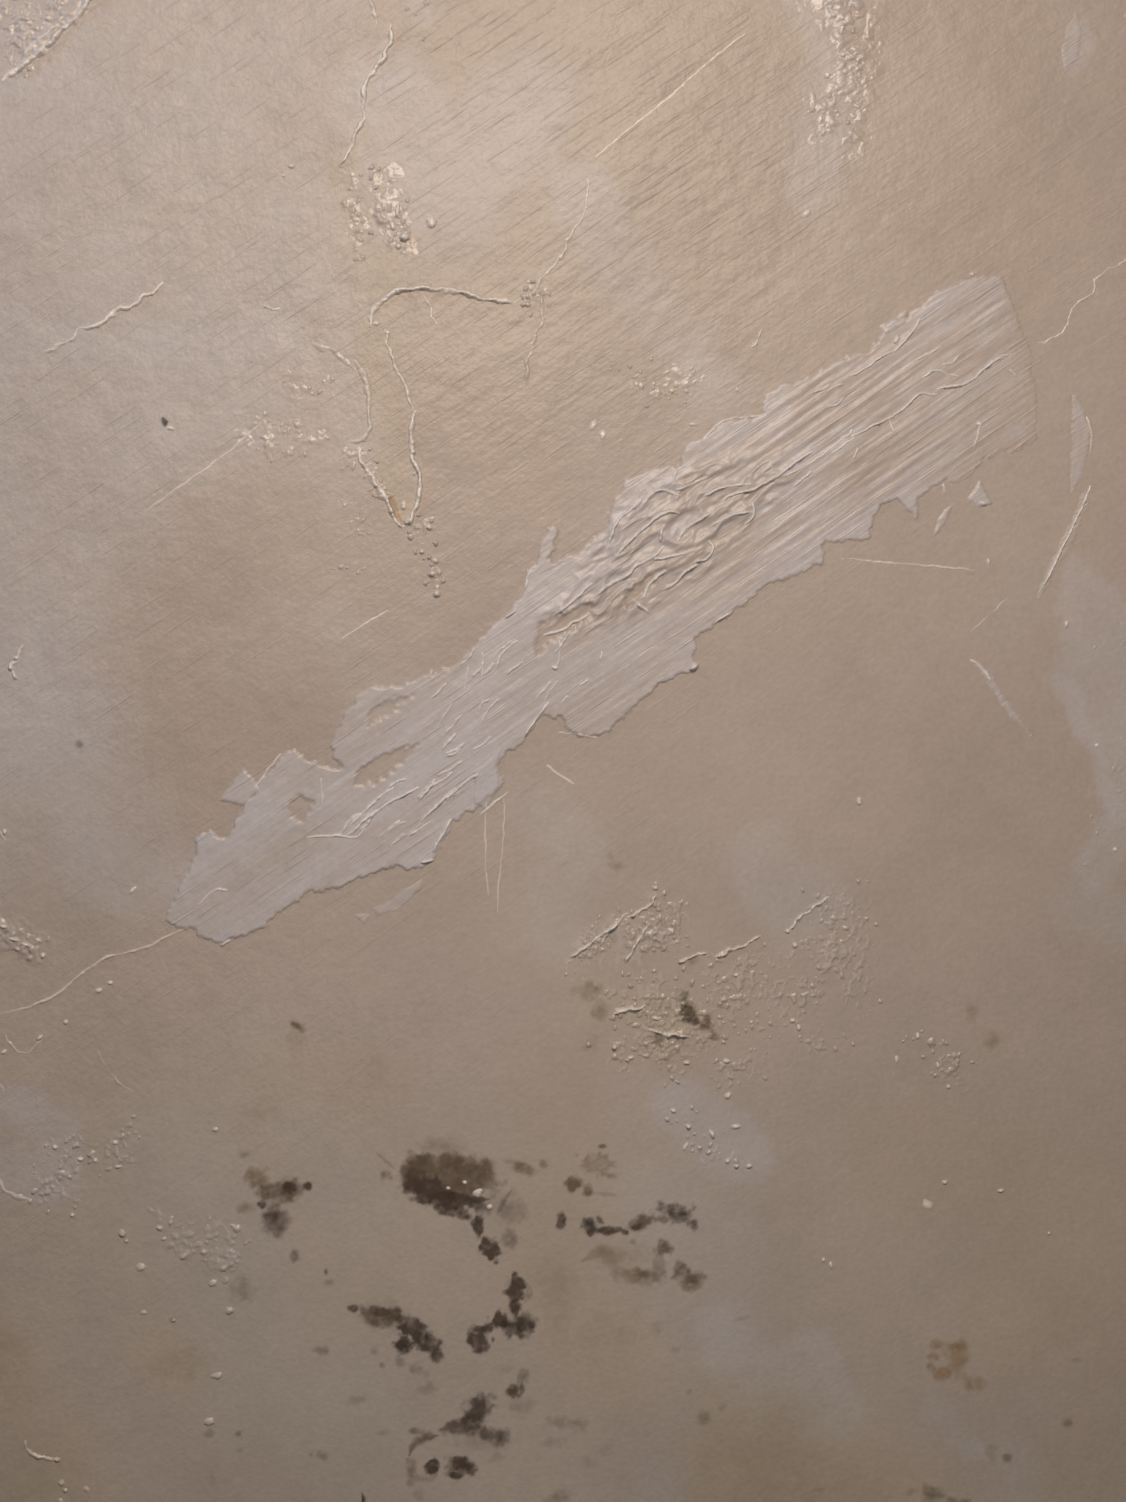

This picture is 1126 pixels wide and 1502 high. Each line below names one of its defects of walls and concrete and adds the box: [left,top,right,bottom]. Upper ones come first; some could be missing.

peeling [933,480,993,537]
peeling [217,769,260,807]
water stain [250,1172,311,1228]
water stain [402,1154,500,1263]
water stain [567,1178,592,1195]
water stain [584,1206,696,1236]
water stain [349,1306,442,1358]
water stain [467,1272,535,1353]
water stain [411,1397,489,1448]
water stain [411,1457,474,1478]